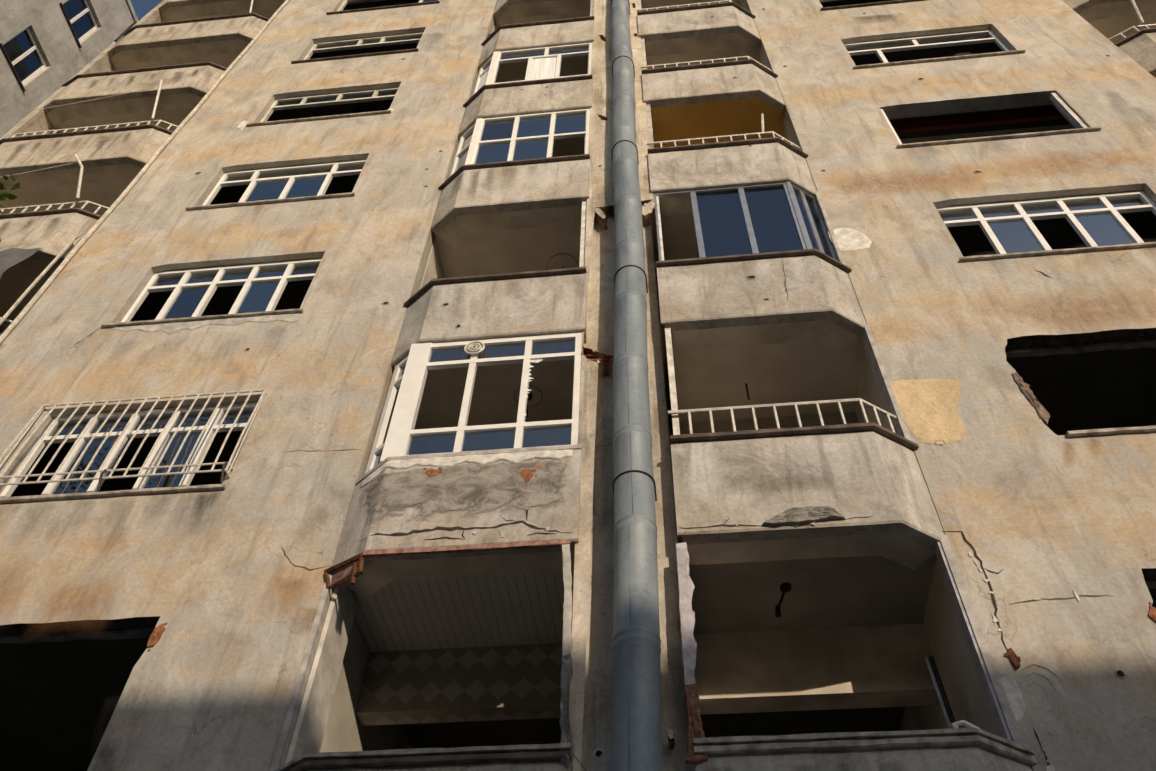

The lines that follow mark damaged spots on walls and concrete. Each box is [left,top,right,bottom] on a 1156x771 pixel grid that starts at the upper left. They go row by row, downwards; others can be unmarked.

spalling [581,346,613,368]
flaking render [360,449,572,523]
peeling [676,542,697,685]
crack [942,530,1110,700]